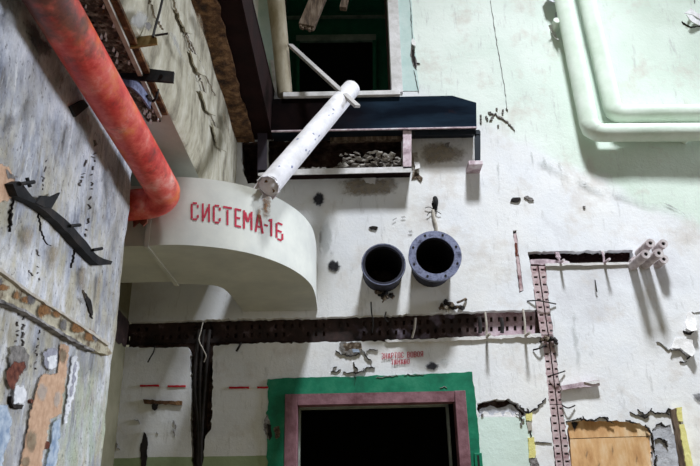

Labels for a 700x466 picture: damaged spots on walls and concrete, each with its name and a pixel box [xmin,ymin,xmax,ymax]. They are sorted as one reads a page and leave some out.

crack [148,0,164,30]
crack [172,0,227,152]
crack [480,1,515,131]
crack [7,199,15,232]
crack [28,214,51,280]
spalling [80,290,93,319]
spalling [337,341,378,362]
peeling [658,312,700,363]
peeling [0,344,80,466]
spalling [479,404,525,425]